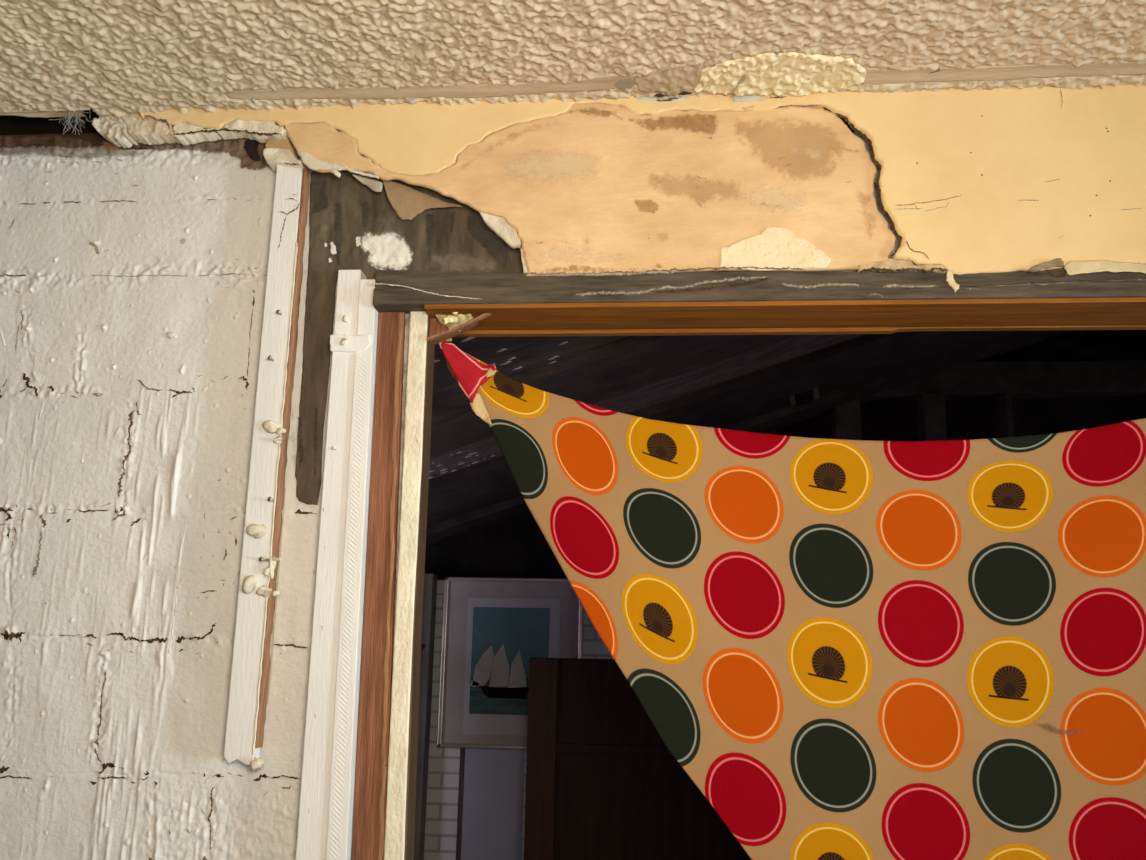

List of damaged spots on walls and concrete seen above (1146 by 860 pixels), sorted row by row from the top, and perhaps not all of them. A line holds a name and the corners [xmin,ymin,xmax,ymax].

crack [0,155,138,229]
crack [207,194,299,247]
flaking render [112,94,896,514]
crack [778,105,961,272]
crack [0,268,256,604]
crack [274,644,309,654]
crack [51,622,299,860]